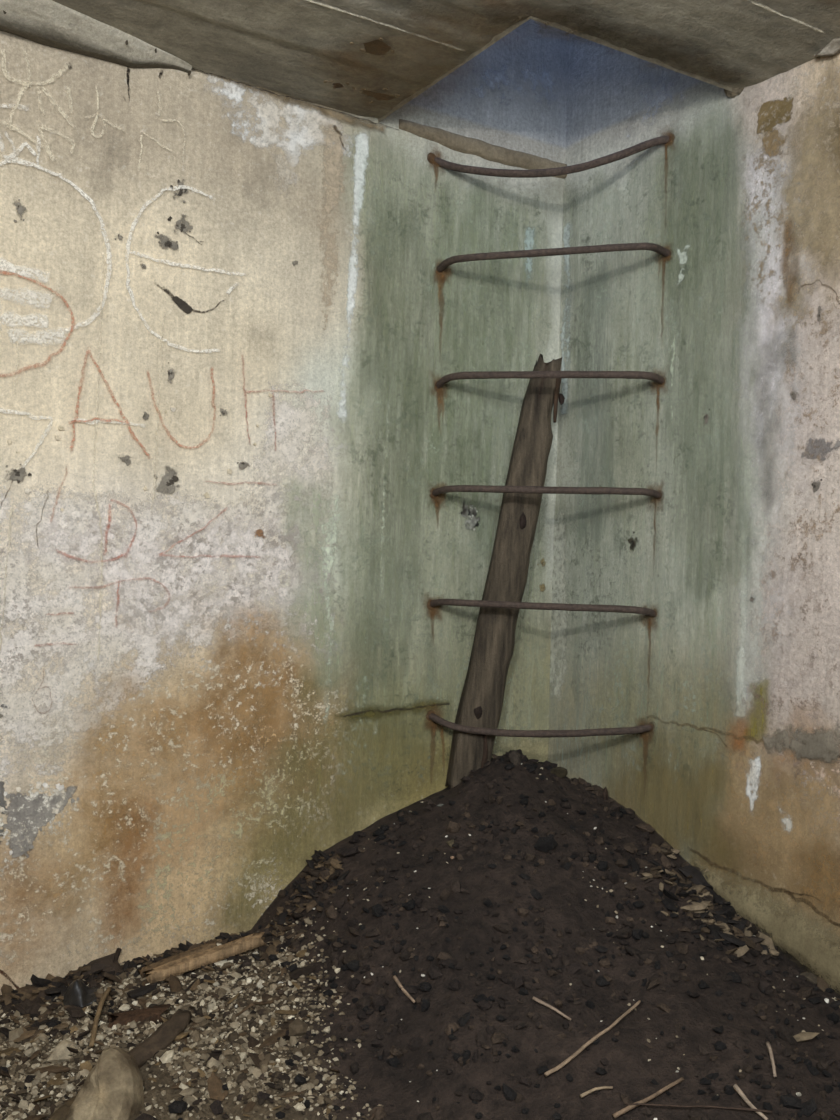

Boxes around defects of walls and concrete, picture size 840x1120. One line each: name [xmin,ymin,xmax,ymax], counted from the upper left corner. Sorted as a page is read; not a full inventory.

water stain [524,227,534,278]
water stain [561,223,571,414]
water stain [677,245,690,283]
water stain [733,75,840,738]
peeling [743,101,840,374]
peeling [0,382,344,965]
water stain [550,511,569,700]
crack [674,722,763,747]
peeling [750,370,840,740]
crack [688,847,840,927]